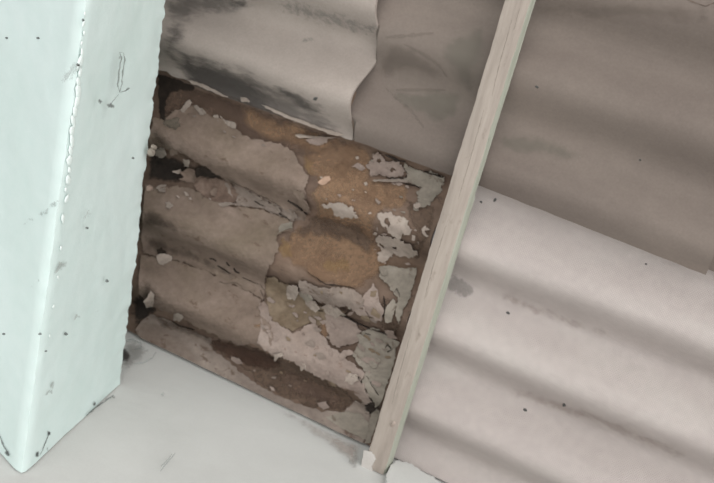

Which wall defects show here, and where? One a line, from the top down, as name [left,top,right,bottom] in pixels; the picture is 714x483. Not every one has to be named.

peeling [188,80,228,97]
damp [165,90,345,156]
peeling [135,100,400,443]
corrosion [283,144,405,287]
peeling [352,152,444,324]